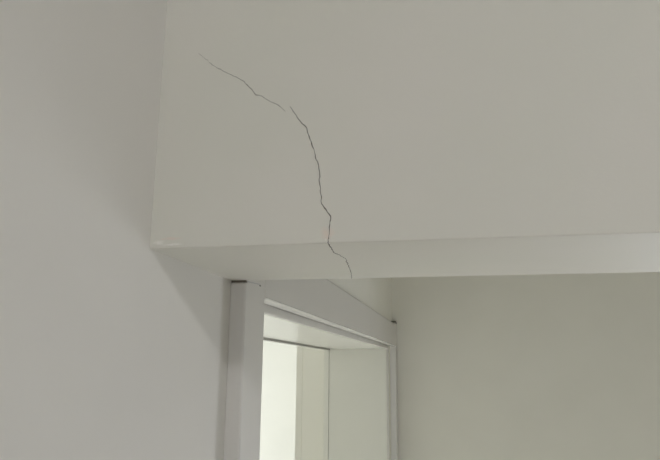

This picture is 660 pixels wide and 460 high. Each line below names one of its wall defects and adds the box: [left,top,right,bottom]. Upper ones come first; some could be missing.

crack [201,55,352,277]